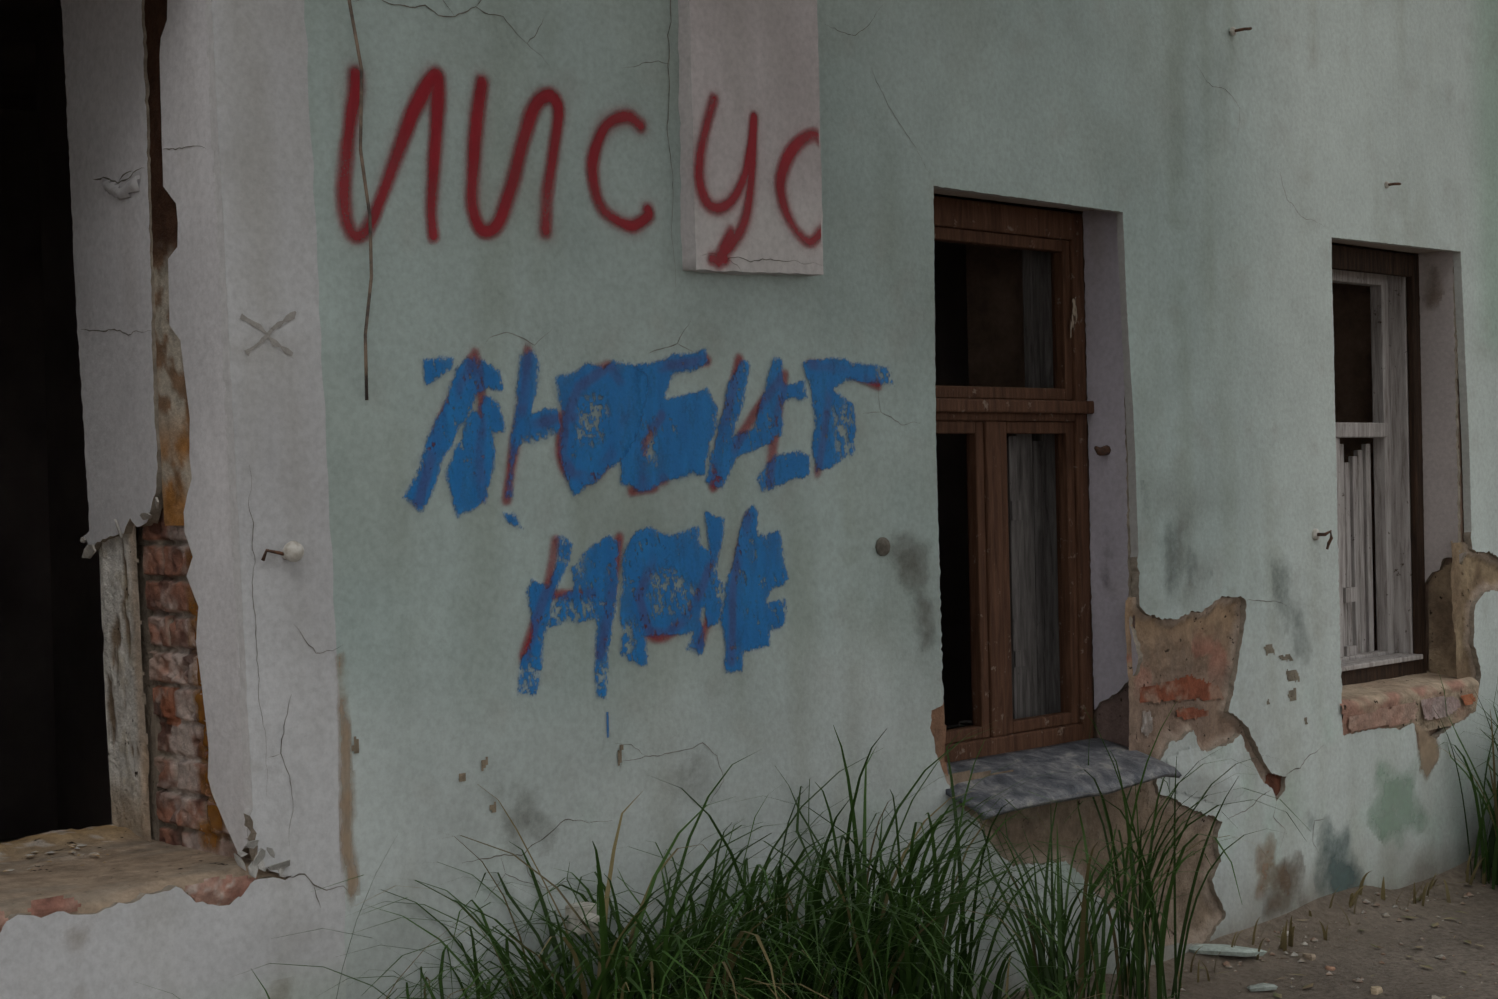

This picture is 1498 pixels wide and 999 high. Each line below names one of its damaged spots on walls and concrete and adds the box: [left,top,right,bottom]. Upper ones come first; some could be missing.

crack [353,0,546,62]
peeling [80,537,96,558]
flaking render [1349,541,1498,732]
flaking render [140,497,290,906]
flaking render [1096,597,1286,796]
peeling [1264,644,1300,701]
spalling [27,895,81,917]